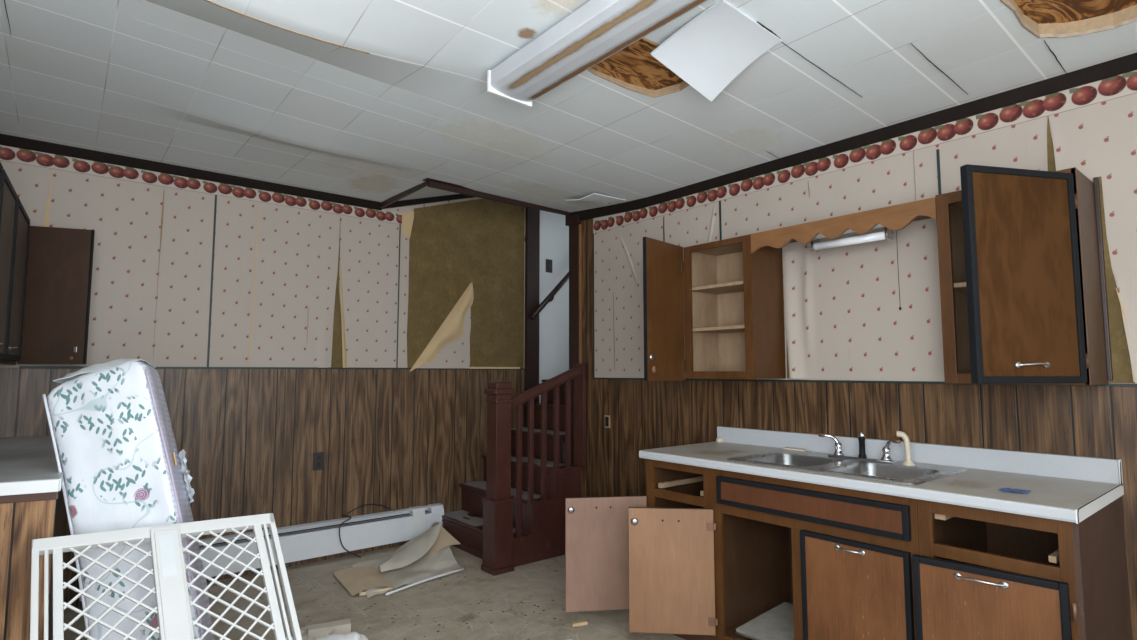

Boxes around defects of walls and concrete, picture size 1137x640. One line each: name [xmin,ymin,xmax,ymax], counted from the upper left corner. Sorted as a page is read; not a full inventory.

damp [519,29,536,38]
spalling [1007,0,1137,34]